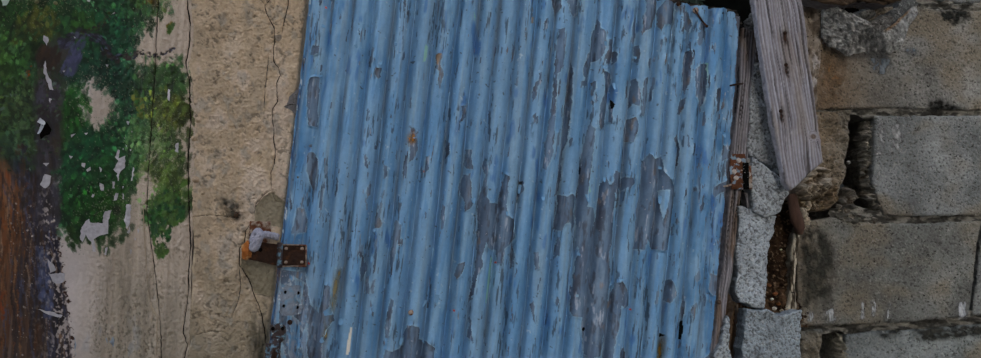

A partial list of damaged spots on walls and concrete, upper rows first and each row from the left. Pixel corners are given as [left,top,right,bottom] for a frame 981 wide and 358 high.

peeling [284,0,382,127]
peeling [40,163,51,188]
peeling [69,121,139,255]
crack [146,0,289,358]
peeling [284,108,452,358]
peeling [454,144,541,325]
peeling [516,0,731,358]